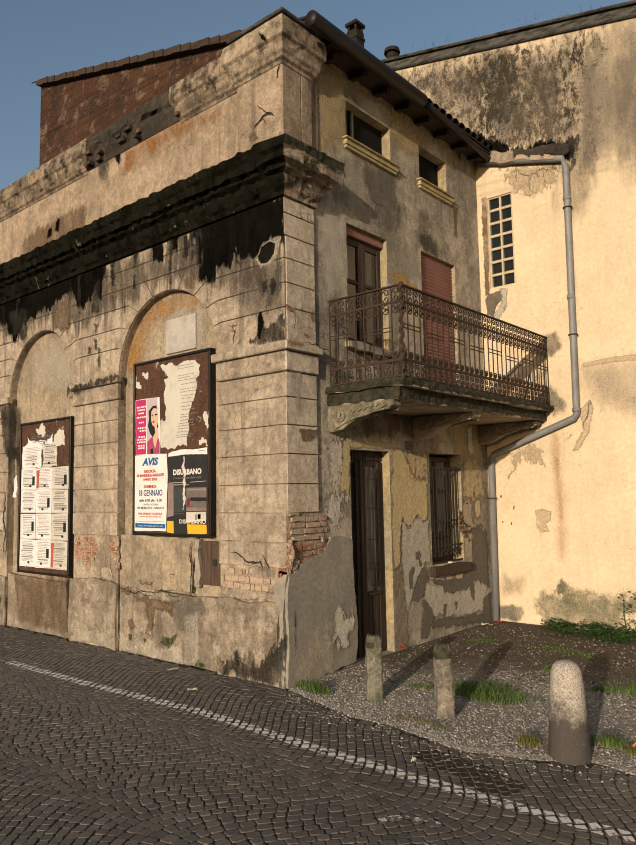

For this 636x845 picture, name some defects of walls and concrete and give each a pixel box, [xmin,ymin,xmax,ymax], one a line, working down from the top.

damp [407,29,636,171]
damp [24,206,86,253]
damp [152,172,311,288]
damp [0,262,116,343]
damp [249,311,285,345]
damp [262,278,276,295]
damp [34,341,117,398]
peeling [573,400,593,451]
flaking render [74,537,98,565]
peeling [223,423,520,653]
damp [536,580,636,630]
damp [221,619,333,689]